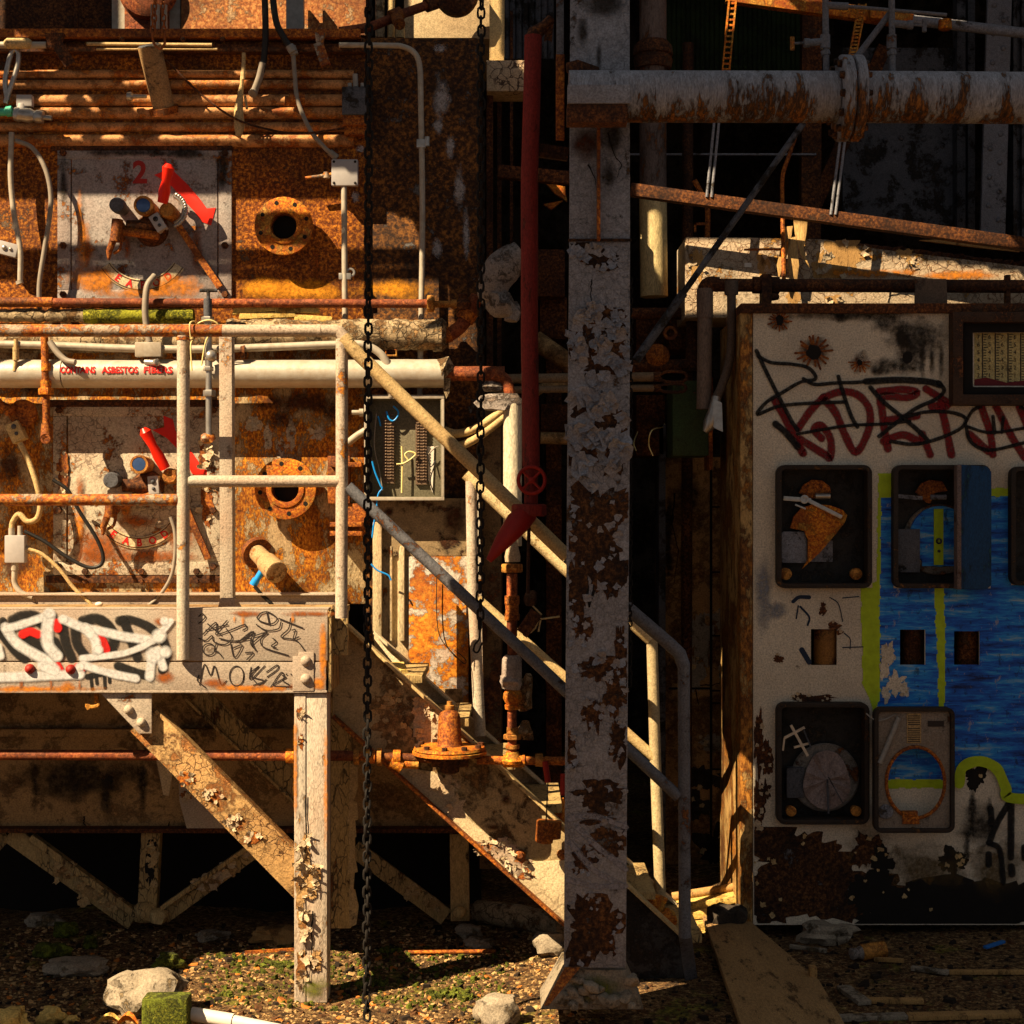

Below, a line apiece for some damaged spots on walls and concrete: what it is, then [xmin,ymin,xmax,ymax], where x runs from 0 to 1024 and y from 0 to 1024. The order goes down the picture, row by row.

corrosion [245,279,336,297]
corrosion [371,282,412,296]
crack [888,264,920,303]
corrosion [255,394,349,426]
peeling [563,300,634,877]
peeling [879,641,909,704]
peeling [177,771,224,804]
spalling [0,833,93,912]
spalling [27,813,331,992]
spalling [354,861,414,911]
spalling [355,833,534,904]
spalling [938,845,969,874]